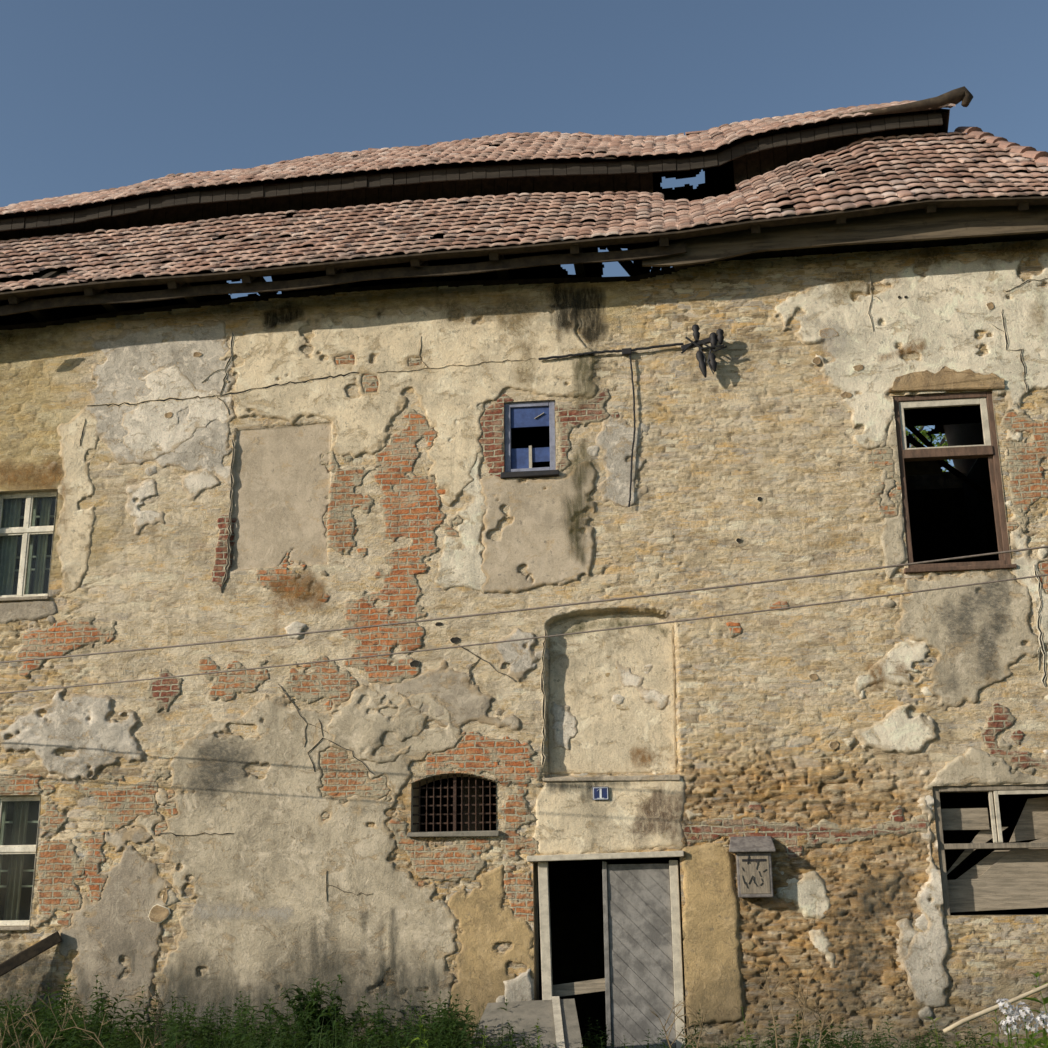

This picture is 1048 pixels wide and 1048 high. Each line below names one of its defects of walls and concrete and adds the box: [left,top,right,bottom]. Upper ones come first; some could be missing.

damp [551,286,603,399]
crack [992,278,1048,392]
crack [80,332,535,593]
damp [567,448,589,550]
damp [192,742,244,788]
crack [278,684,375,775]
crack [458,629,548,768]
peeling [0,251,1048,1044]
damp [959,578,1006,674]
crack [1034,564,1048,686]